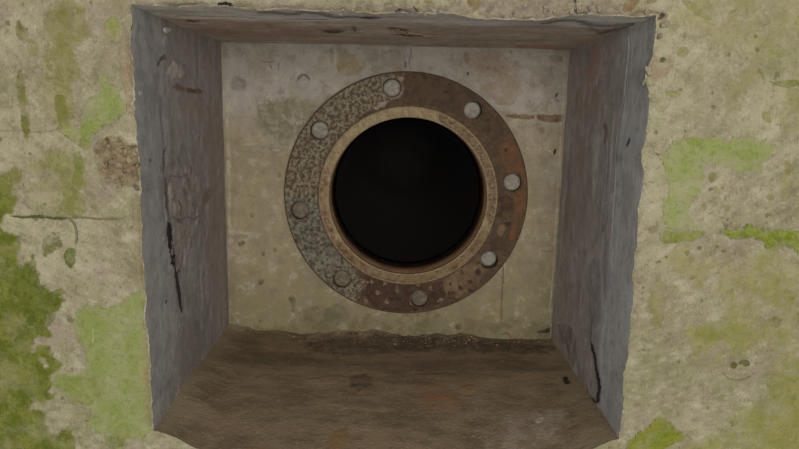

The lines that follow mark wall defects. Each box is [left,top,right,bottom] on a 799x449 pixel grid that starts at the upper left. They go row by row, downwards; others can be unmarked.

peeling [56,74,151,191]
crack [160,98,182,312]
rust [320,73,562,312]
crack [585,315,602,404]